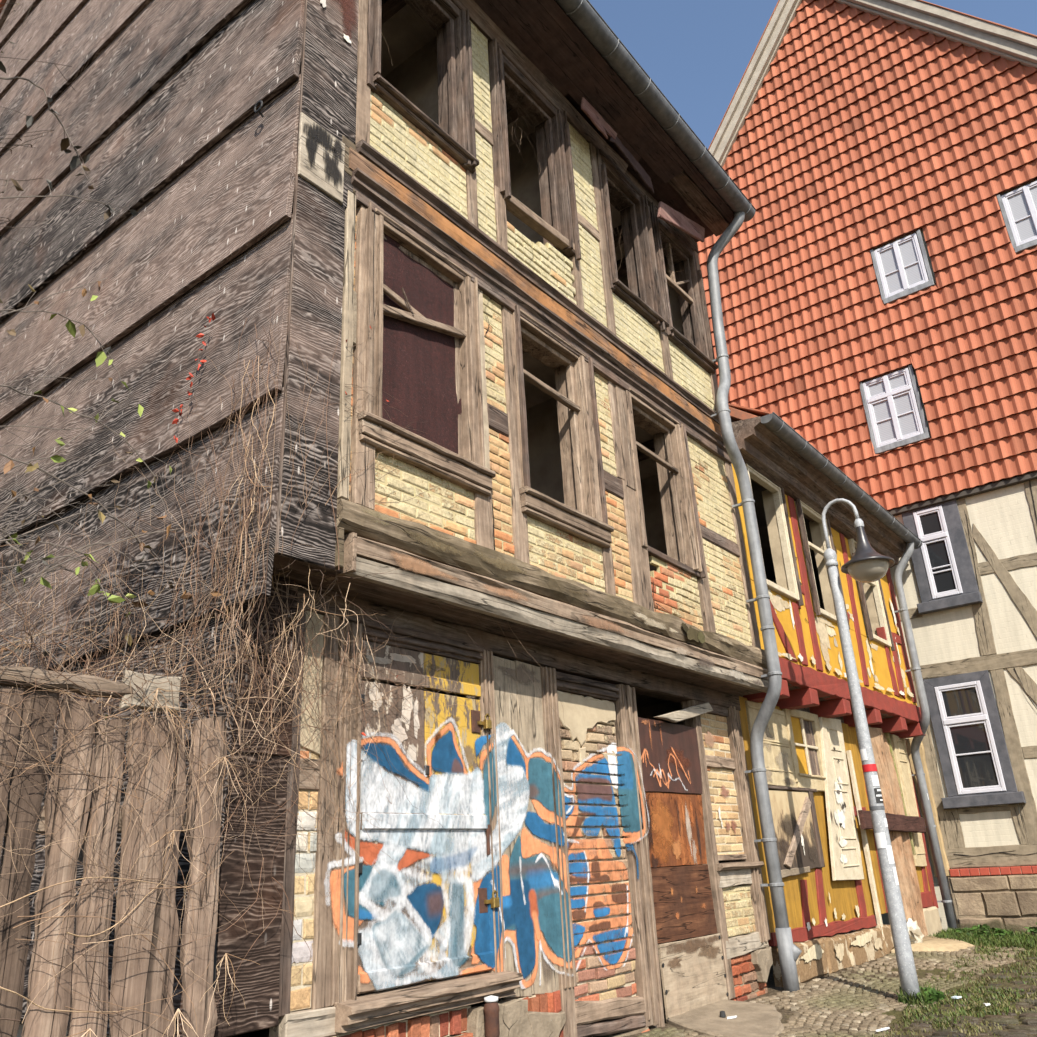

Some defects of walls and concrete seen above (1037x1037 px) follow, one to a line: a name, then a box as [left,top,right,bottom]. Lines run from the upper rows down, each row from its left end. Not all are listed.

peeling [366,653,416,664]
peeling [368,681,384,712]
peeling [391,684,420,764]
spalling [557,691,616,765]
peeling [831,776,848,863]
peeling [807,893,860,931]
flaking render [800,932,883,963]